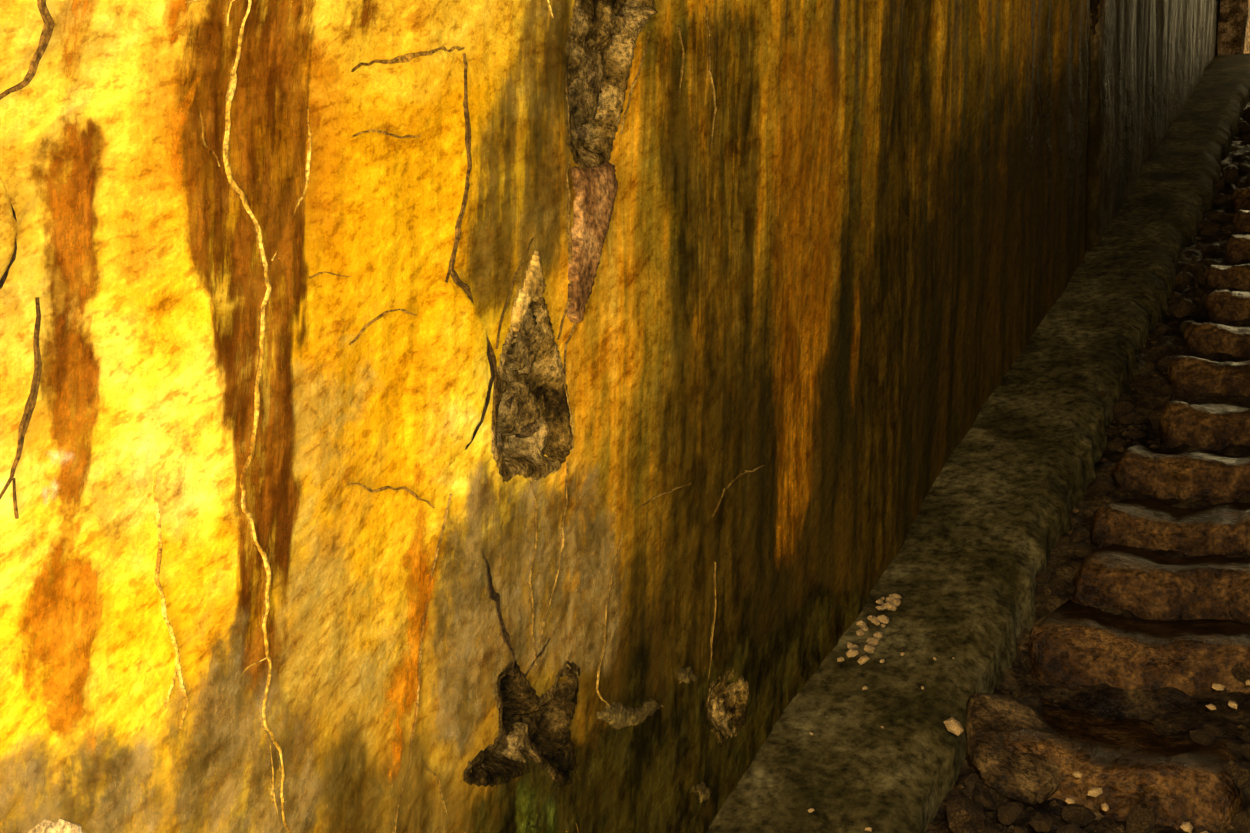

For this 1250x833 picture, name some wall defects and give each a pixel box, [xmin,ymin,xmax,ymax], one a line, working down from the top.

crack [0,0,55,100]
corrosion [63,0,93,74]
corrosion [168,0,188,44]
corrosion [171,83,195,189]
crack [295,106,312,213]
spalling [564,0,658,323]
crack [0,297,42,519]
corrosion [41,119,99,515]
crack [153,0,290,833]
spalling [491,250,574,482]
corrosion [18,539,102,749]
spalling [463,660,580,787]